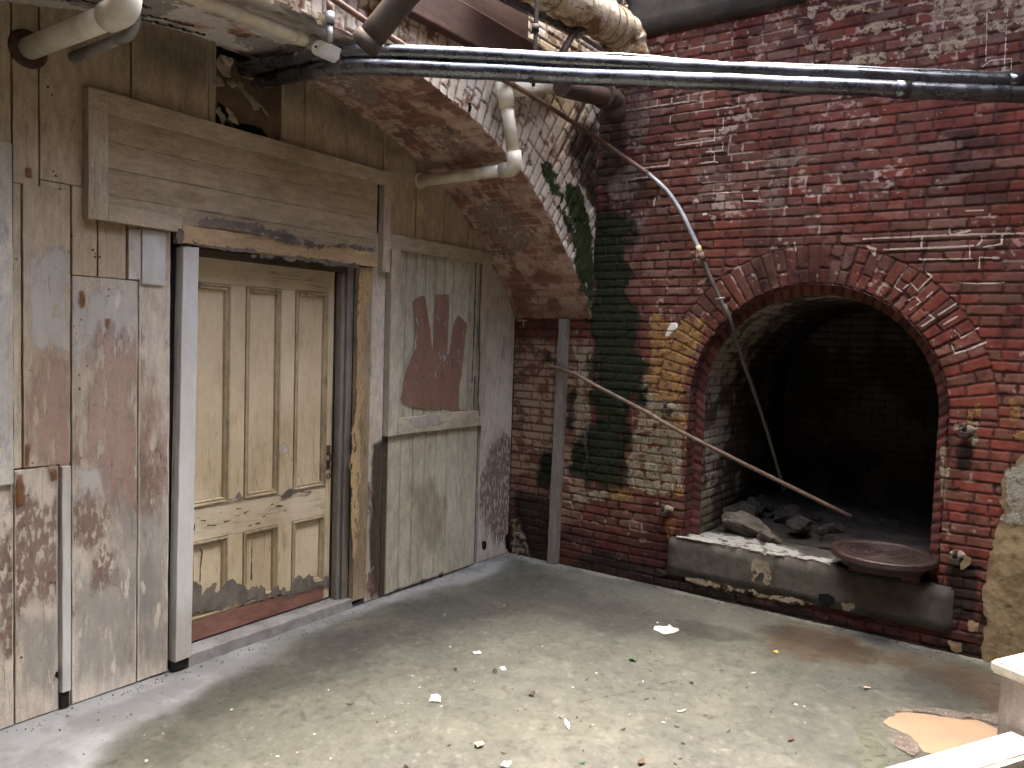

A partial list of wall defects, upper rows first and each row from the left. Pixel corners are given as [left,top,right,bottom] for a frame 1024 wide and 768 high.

peeling [176,217,374,382]
peeling [1000,462,1024,526]
peeling [74,467,113,590]
peeling [0,495,56,659]
peeling [192,574,330,614]
spalling [893,731,921,756]
spalling [895,706,998,724]